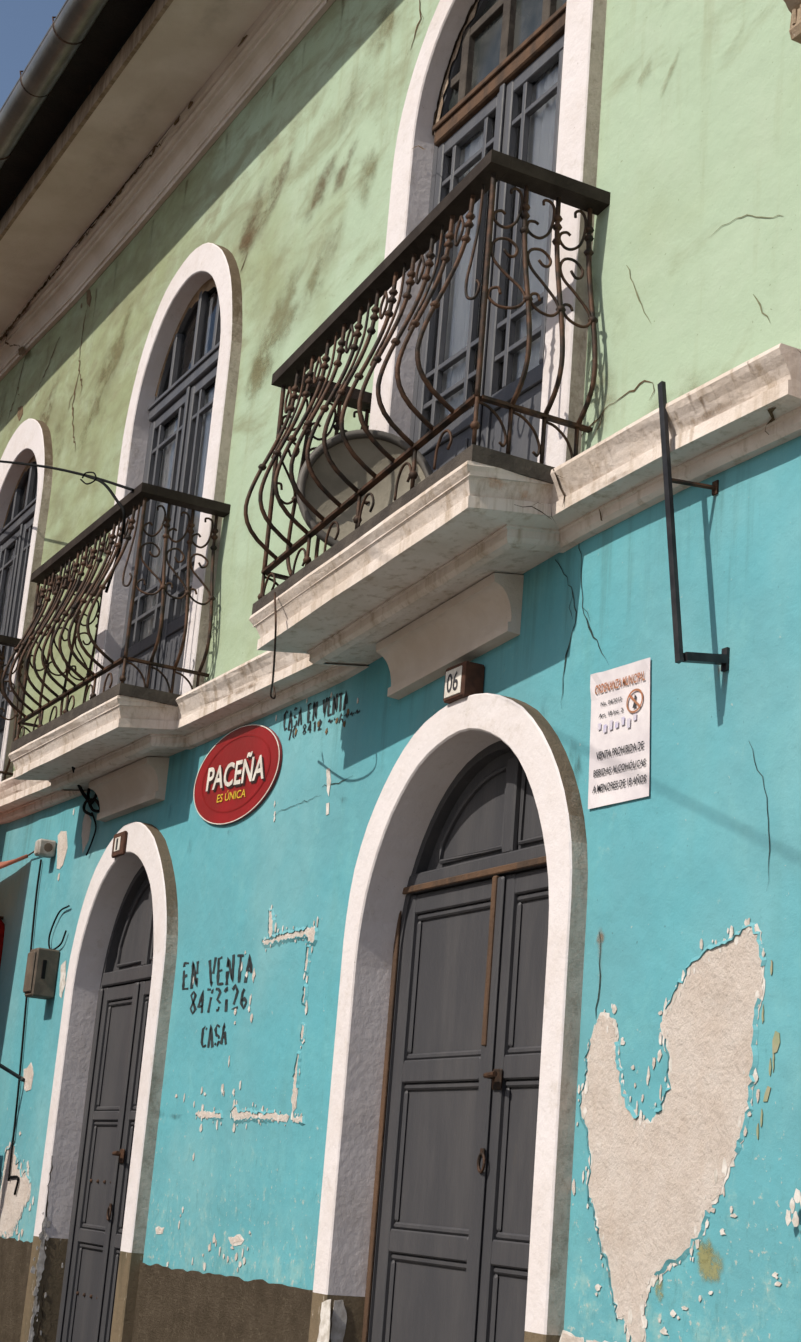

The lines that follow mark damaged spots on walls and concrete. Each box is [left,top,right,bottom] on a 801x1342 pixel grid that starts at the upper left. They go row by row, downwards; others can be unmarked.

crack [0,132,169,443]
water stain [240,216,256,250]
crack [711,214,782,236]
crack [514,469,566,519]
crack [555,547,609,708]
crack [749,742,770,891]
peeling [23,1063,34,1091]
peeling [175,905,319,1132]
peeling [559,918,780,1342]
peeling [0,1131,51,1342]
peeling [785,1189,801,1227]